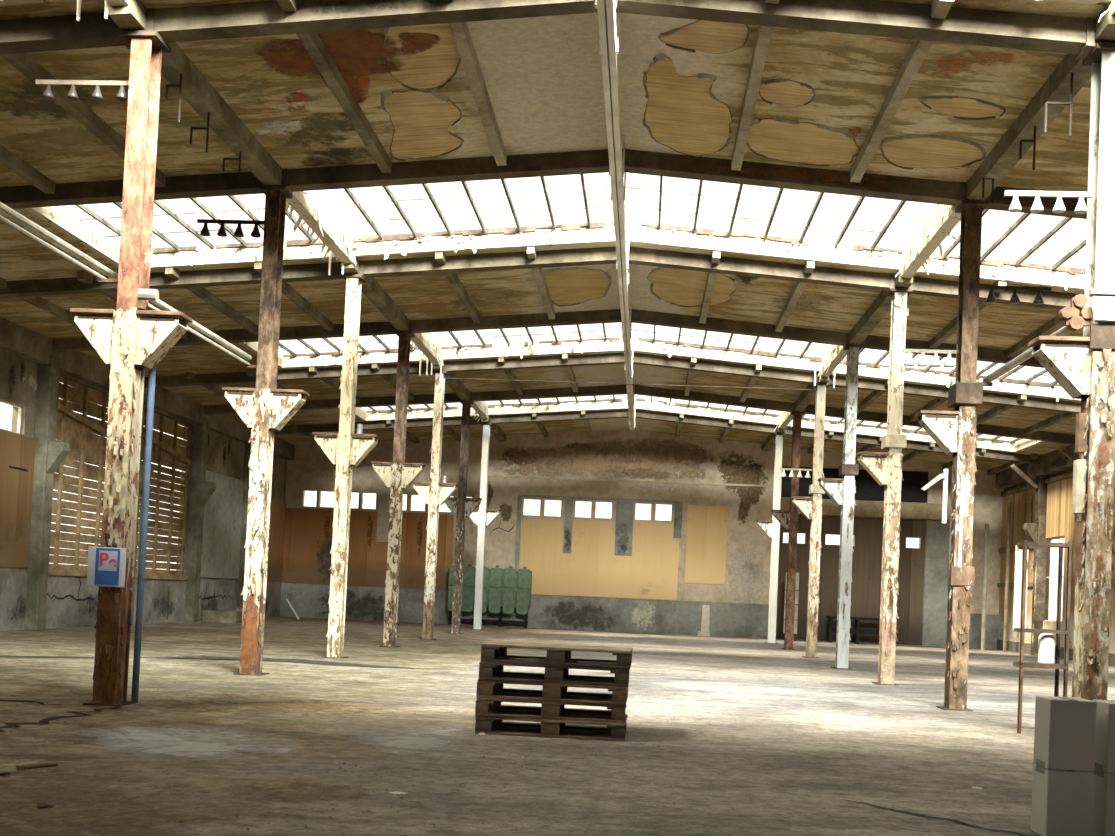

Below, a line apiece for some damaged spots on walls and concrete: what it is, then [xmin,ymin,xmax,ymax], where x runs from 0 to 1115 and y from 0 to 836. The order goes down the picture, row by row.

rust [256,40,328,85]
rust [286,93,308,113]
rust [317,30,440,104]
flaking render [380,23,465,161]
flaking render [642,20,751,157]
flaking render [746,79,861,167]
flaking render [543,267,612,307]
flaking render [647,267,740,308]
peeling [325,288,359,389]
peeling [329,488,350,573]
peeling [1078,349,1115,631]
rust [241,547,257,673]